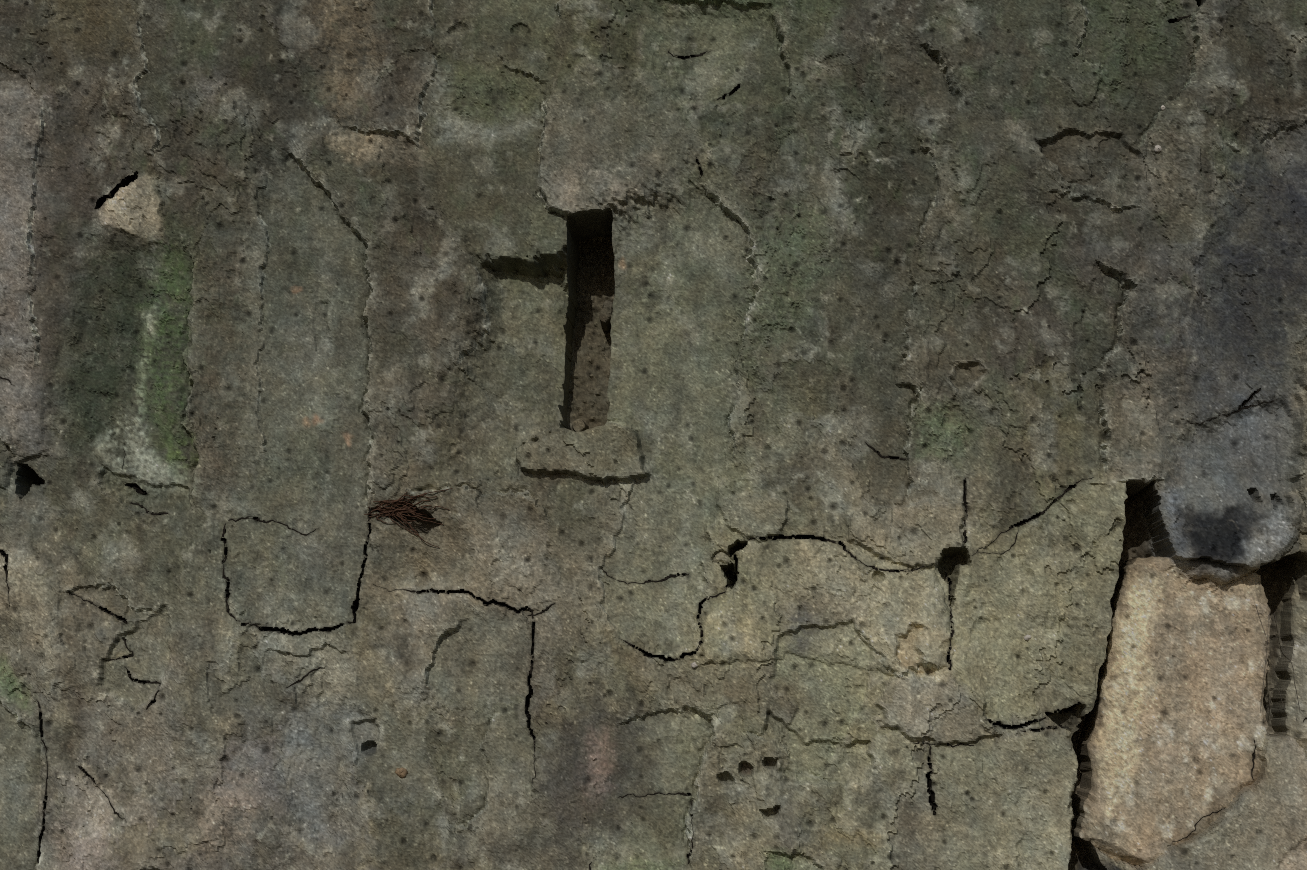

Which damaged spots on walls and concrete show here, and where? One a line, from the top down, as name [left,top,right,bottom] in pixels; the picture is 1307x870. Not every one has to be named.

water stain [1184,363,1301,426]
crack [0,525,10,604]
crack [221,508,555,781]
crack [601,535,954,669]
crack [963,477,1093,555]
crack [915,703,1081,814]